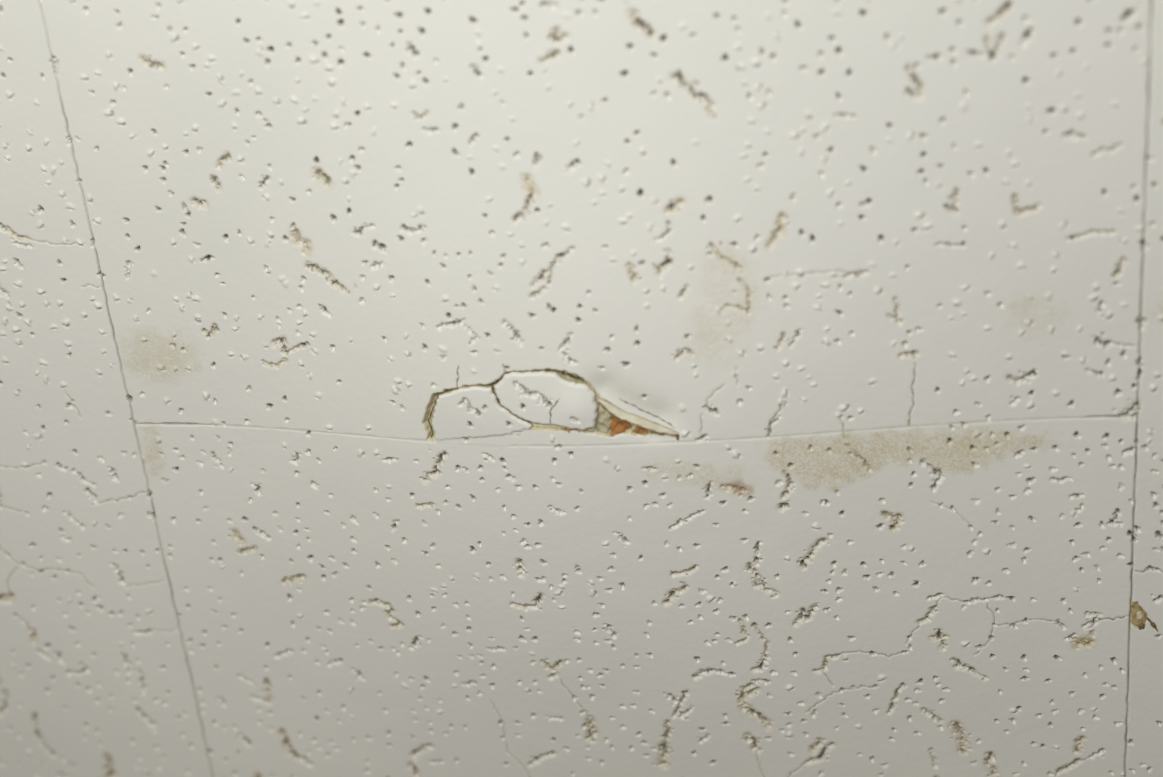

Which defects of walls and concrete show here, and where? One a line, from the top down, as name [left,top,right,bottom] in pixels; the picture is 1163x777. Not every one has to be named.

spalling [431,370,598,450]